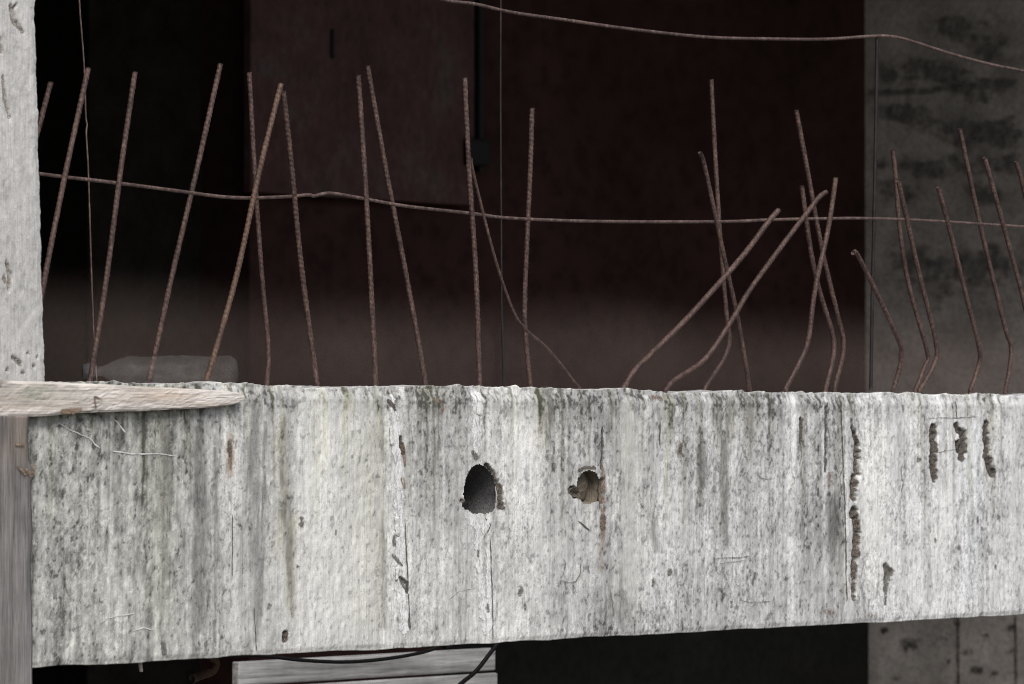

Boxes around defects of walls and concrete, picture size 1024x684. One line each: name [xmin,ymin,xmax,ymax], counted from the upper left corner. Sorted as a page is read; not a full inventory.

spalling [465,463,505,535]